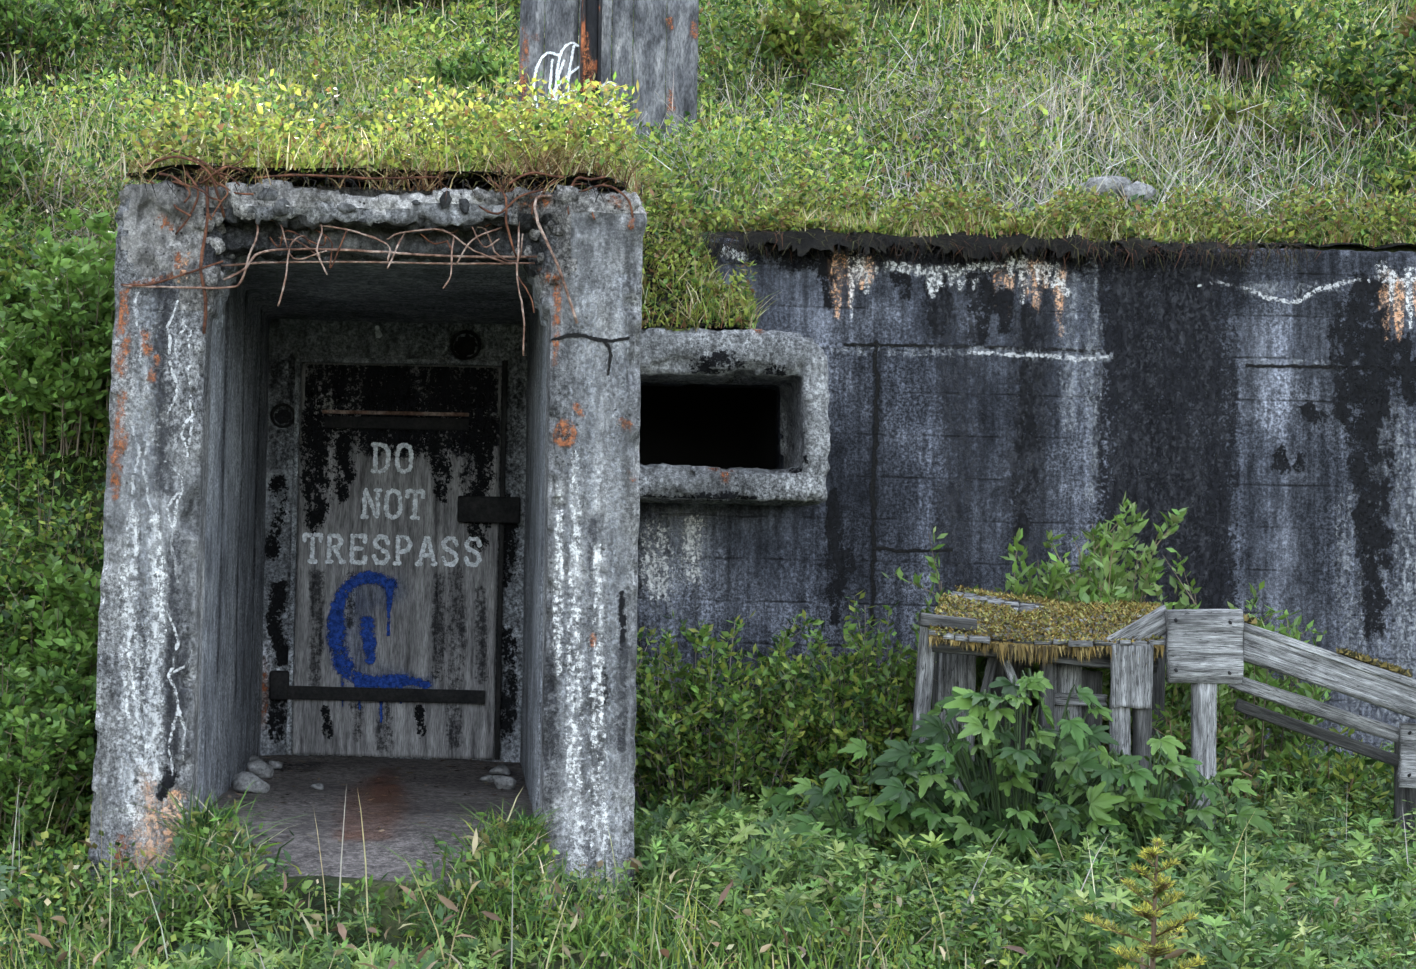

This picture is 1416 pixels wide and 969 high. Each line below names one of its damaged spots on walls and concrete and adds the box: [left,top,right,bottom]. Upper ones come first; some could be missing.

rust [539,268,562,360]
rust [831,250,878,319]
rust [927,273,974,299]
rust [993,255,1070,332]
rust [1376,264,1416,340]
rust [110,253,190,500]
rust [553,403,584,447]
damp [1297,270,1416,639]
rust [115,769,186,875]